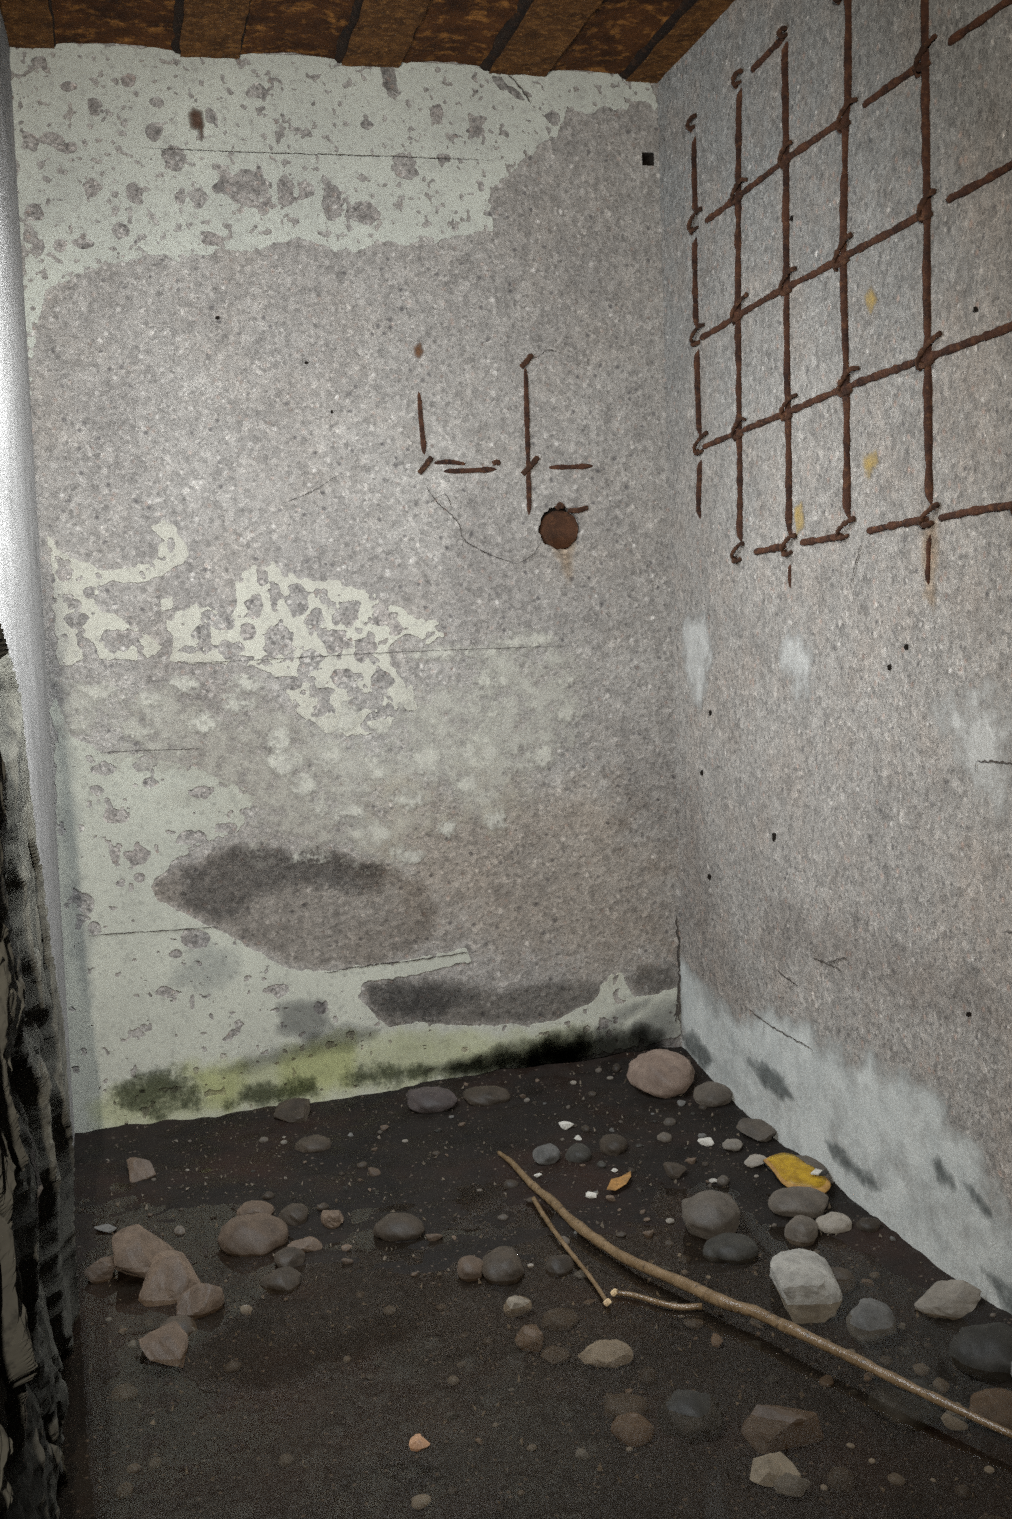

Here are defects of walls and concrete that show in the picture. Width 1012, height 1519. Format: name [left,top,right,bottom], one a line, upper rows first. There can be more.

peeling [9,43,658,396]
rust [417,392,501,475]
rust [519,353,593,515]
peeling [47,520,681,1133]
water stain [118,1072,197,1119]
water stain [226,1081,315,1107]
water stain [353,1025,662,1082]
water stain [680,961,1012,1314]